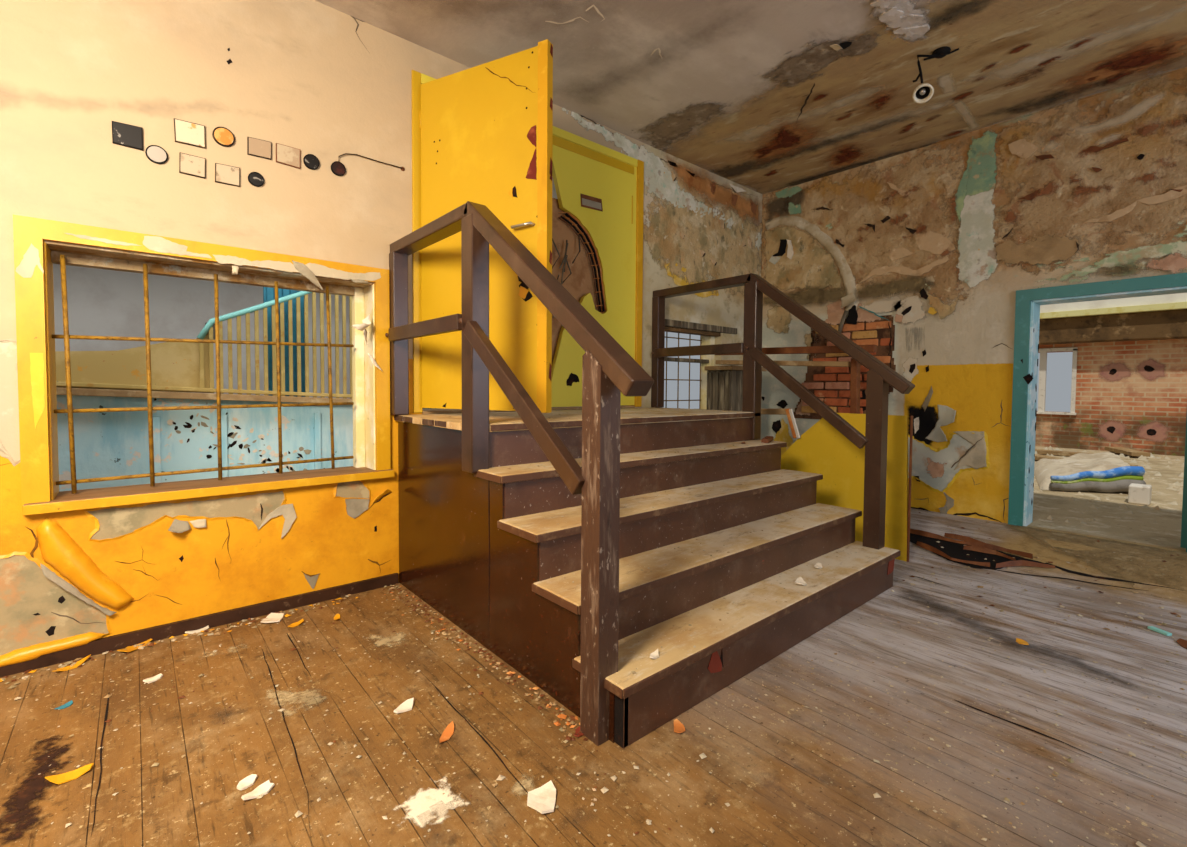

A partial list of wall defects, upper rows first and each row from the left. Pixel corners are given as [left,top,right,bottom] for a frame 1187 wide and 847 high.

corrosion [1005,38,1092,86]
corrosion [1063,37,1187,86]
corrosion [752,122,817,176]
corrosion [827,144,866,166]
flaking render [987,74,1187,275]
flaking render [643,141,969,434]
flaking render [0,339,45,466]
flaking render [908,386,990,512]
flaking render [84,489,297,543]
flaking render [0,551,111,656]
crack [116,549,182,605]
crack [215,520,231,581]